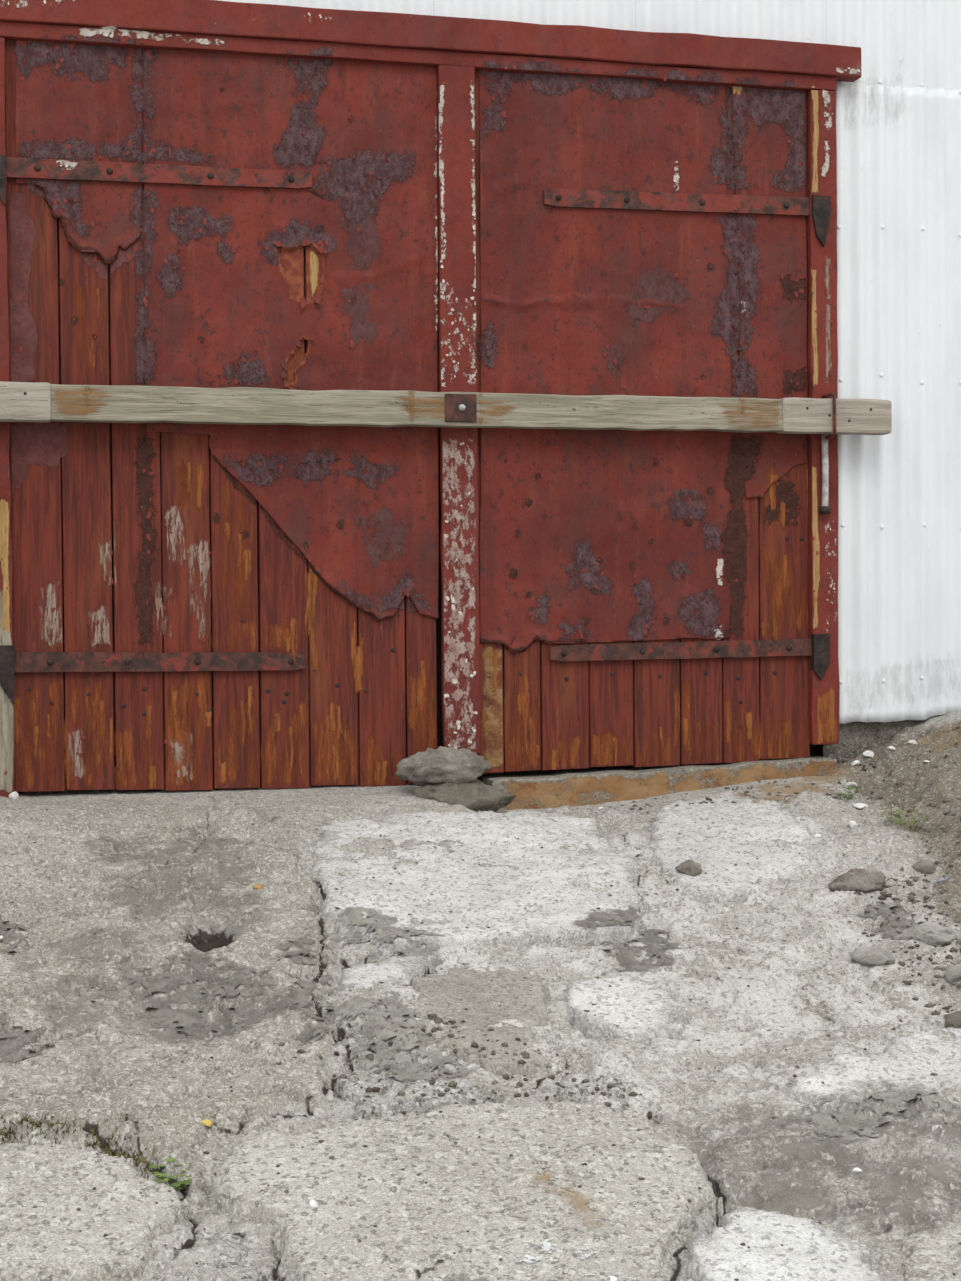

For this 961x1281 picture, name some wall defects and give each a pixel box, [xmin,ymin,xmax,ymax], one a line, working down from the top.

peeling [260,46,416,348]
peeling [434,58,834,398]
peeling [87,606,111,647]
peeling [99,537,117,586]
peeling [133,435,211,645]
corrosion [177,456,382,693]
peeling [336,438,478,749]
peeling [667,435,764,639]
peeling [763,466,837,633]
peeling [65,730,87,779]
crack [82,1108,285,1281]
crack [671,1167,726,1281]